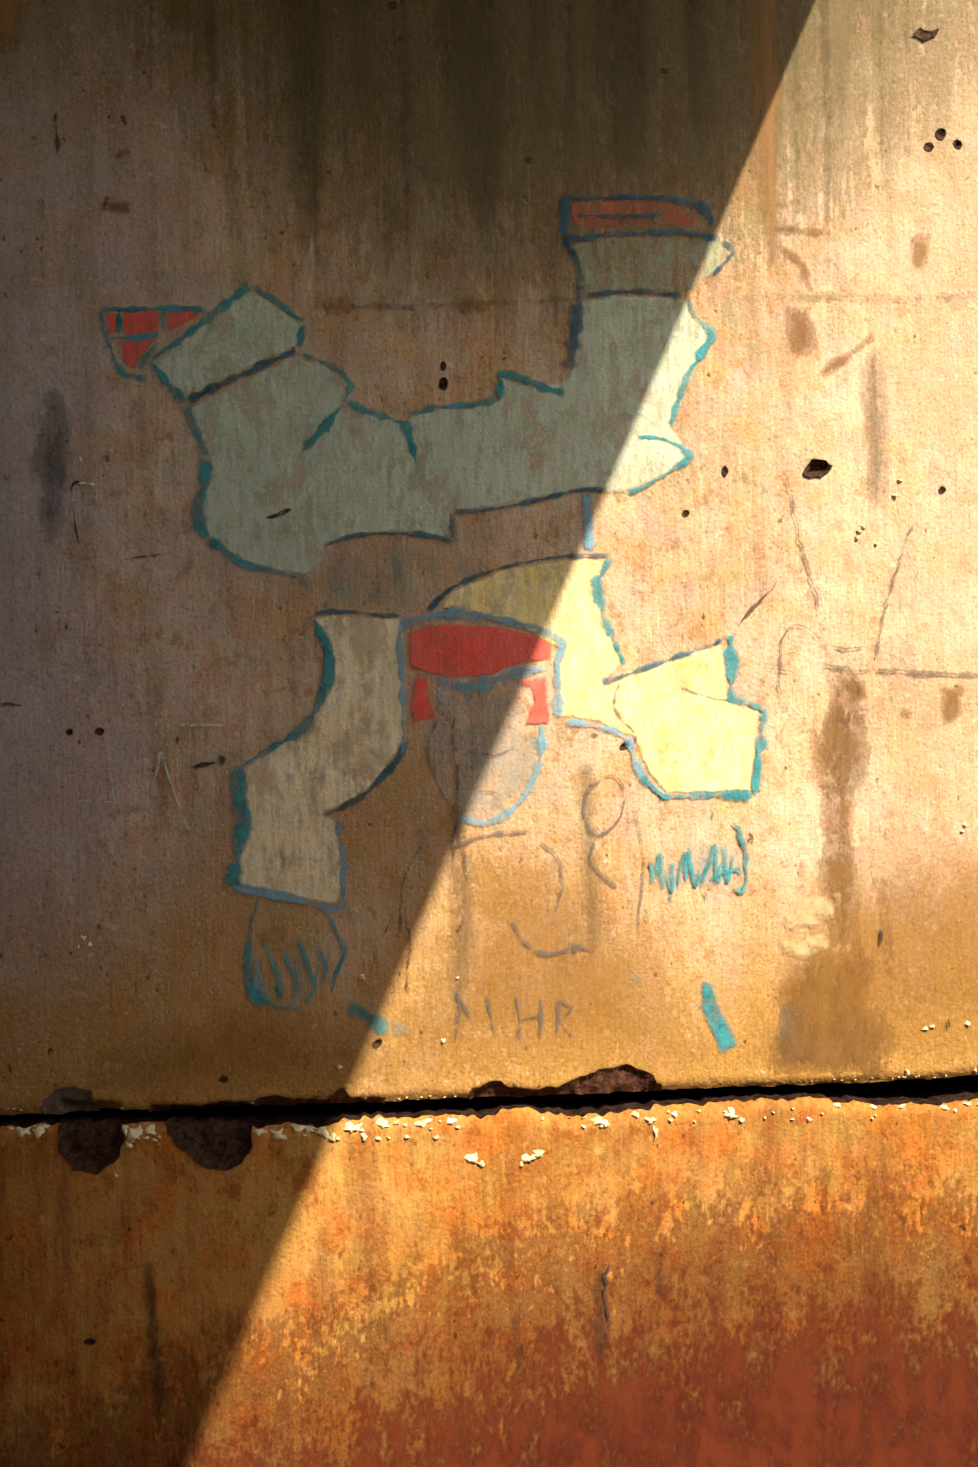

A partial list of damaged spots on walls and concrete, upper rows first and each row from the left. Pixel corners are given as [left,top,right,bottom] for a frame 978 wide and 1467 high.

damp [168,0,908,283]
crack [741,480,978,701]
damp [7,1108,50,1139]
damp [121,1107,161,1149]
damp [253,1118,460,1142]
damp [570,1116,609,1129]
damp [631,1110,701,1142]
damp [723,1107,745,1123]
damp [463,1153,485,1167]
damp [520,1150,545,1168]